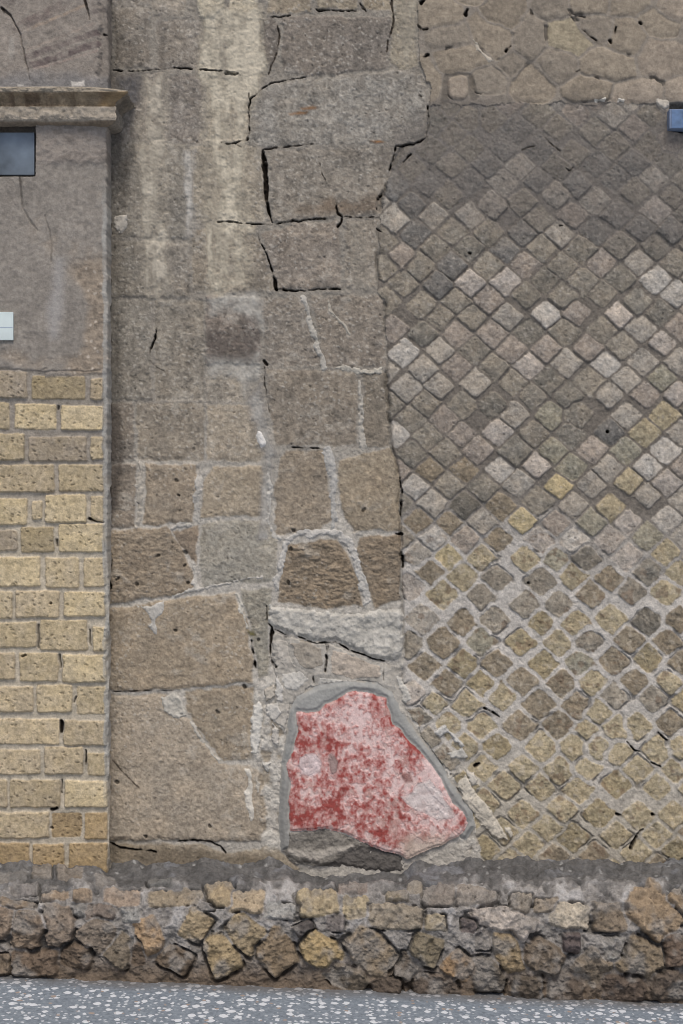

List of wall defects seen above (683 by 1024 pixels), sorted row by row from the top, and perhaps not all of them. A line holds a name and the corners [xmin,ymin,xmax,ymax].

crack [113,15,382,451]
crack [170,446,384,682]
crack [395,477,404,568]
crack [111,839,226,853]
crack [615,812,654,849]